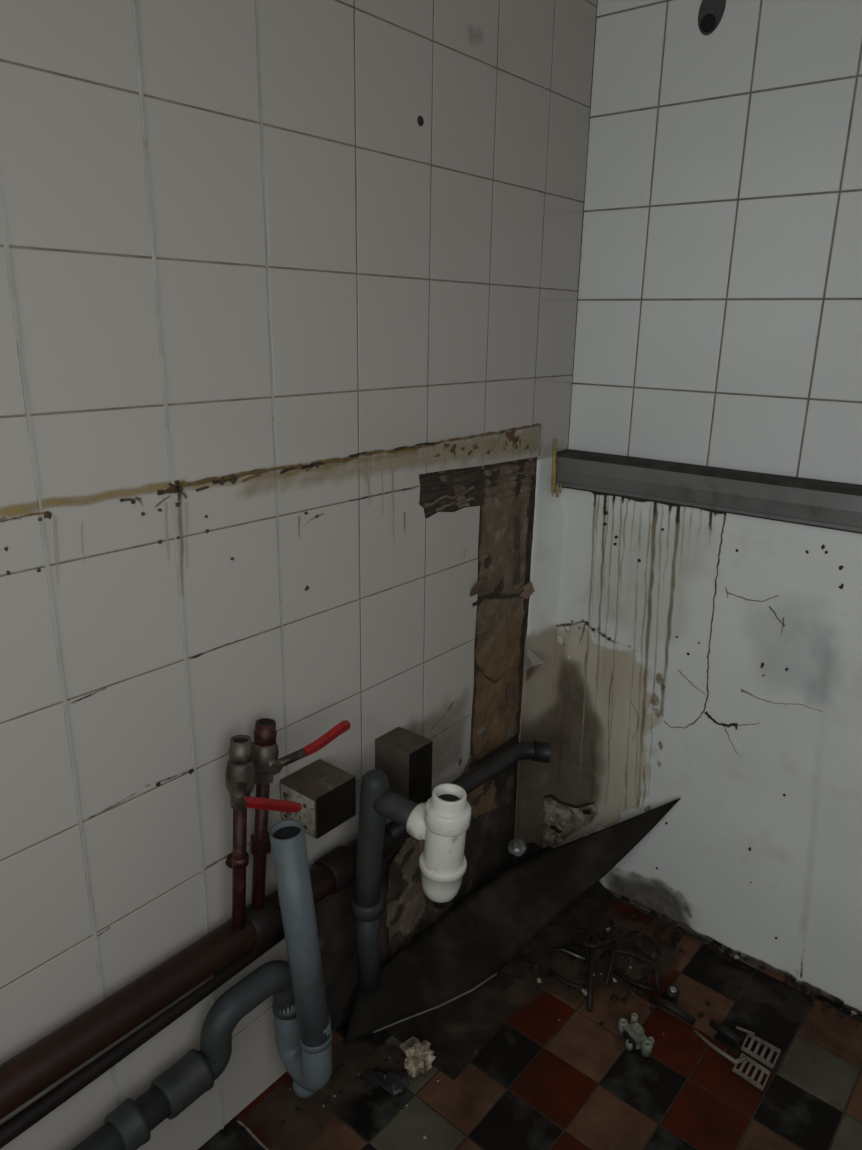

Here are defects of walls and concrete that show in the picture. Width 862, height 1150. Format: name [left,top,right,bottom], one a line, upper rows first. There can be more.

spalling [379,457,665,968]
crack [664,514,785,754]
spalling [314,881,359,1029]
leakage [609,875,690,925]